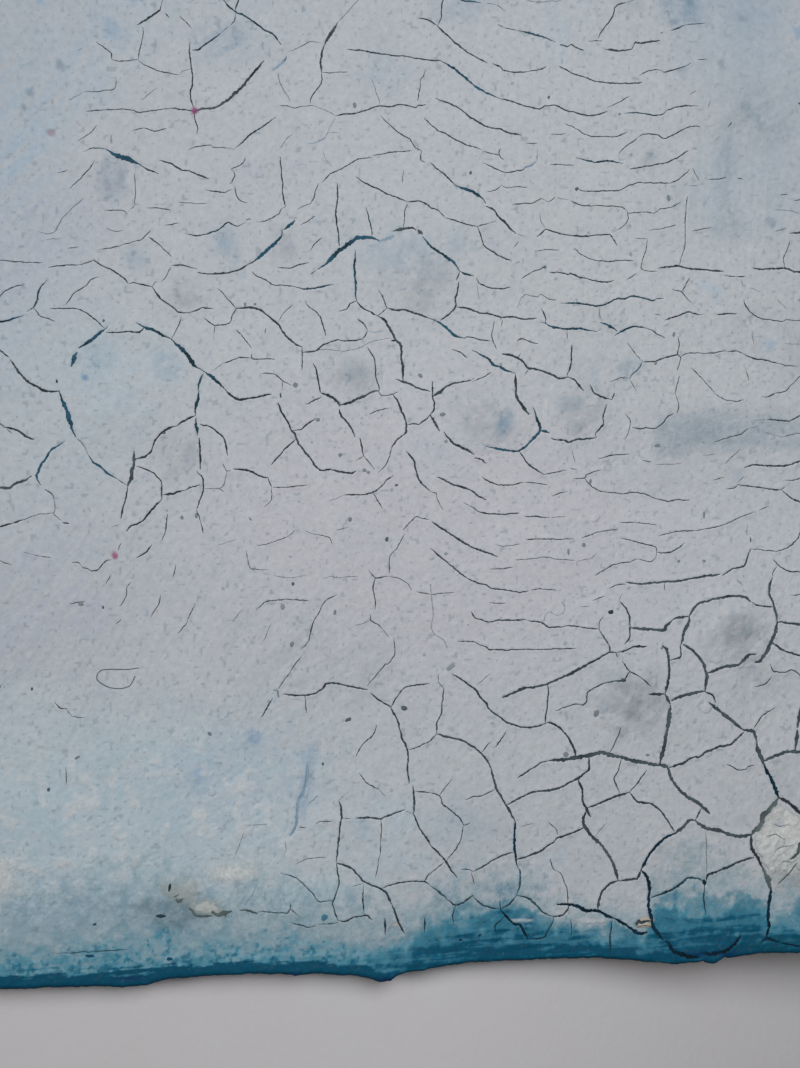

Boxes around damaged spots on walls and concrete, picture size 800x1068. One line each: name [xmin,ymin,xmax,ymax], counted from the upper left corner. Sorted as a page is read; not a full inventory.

crack [0,0,800,583]
peeling [162,882,258,917]
crack [234,507,800,959]
peeling [755,805,800,886]